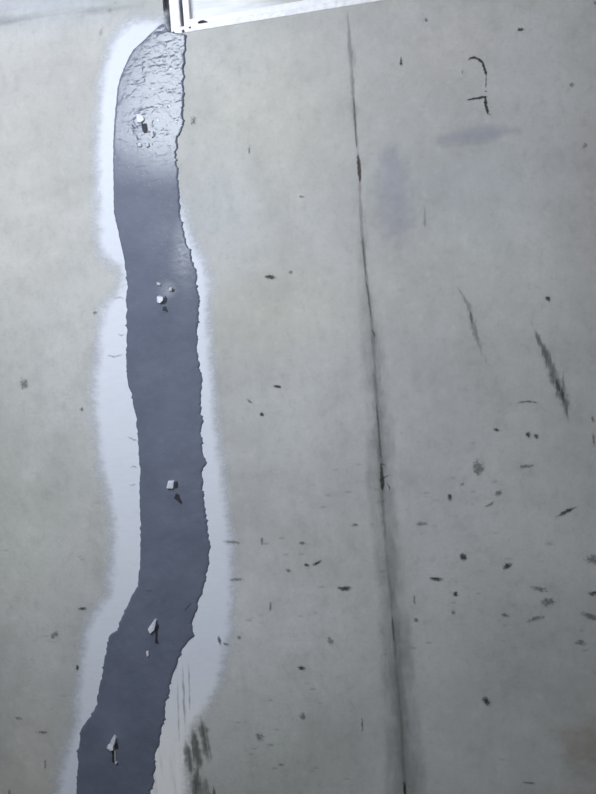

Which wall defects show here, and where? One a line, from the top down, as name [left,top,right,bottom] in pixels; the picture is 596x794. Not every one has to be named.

crack [467,56,489,114]
crack [355,156,363,182]
water stain [53,16,164,794]
water stain [150,202,235,794]
crack [378,464,386,491]